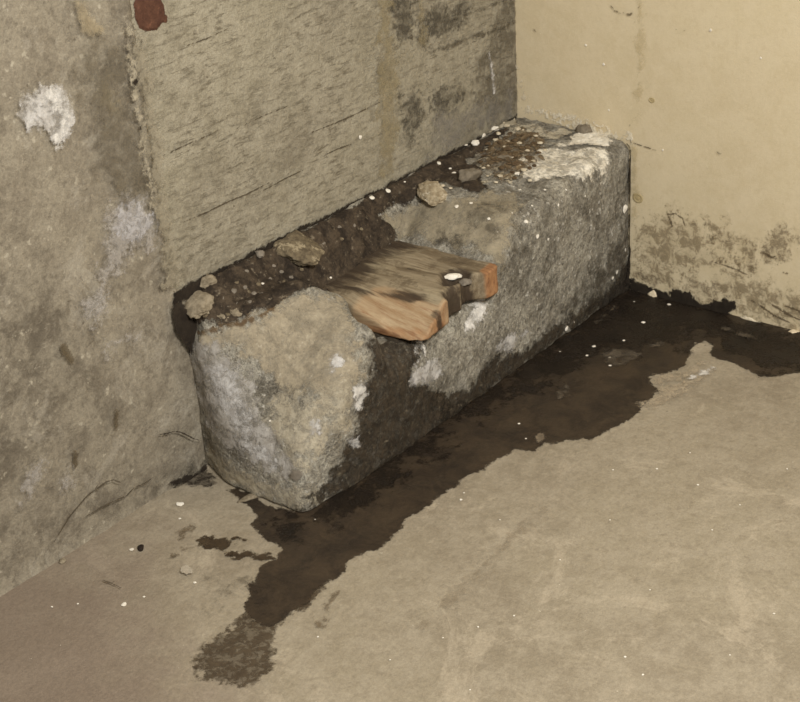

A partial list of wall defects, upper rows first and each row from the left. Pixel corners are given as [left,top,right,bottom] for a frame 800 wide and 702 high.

corrosion [133,0,167,31]
damp [17,84,75,150]
damp [190,208,800,688]